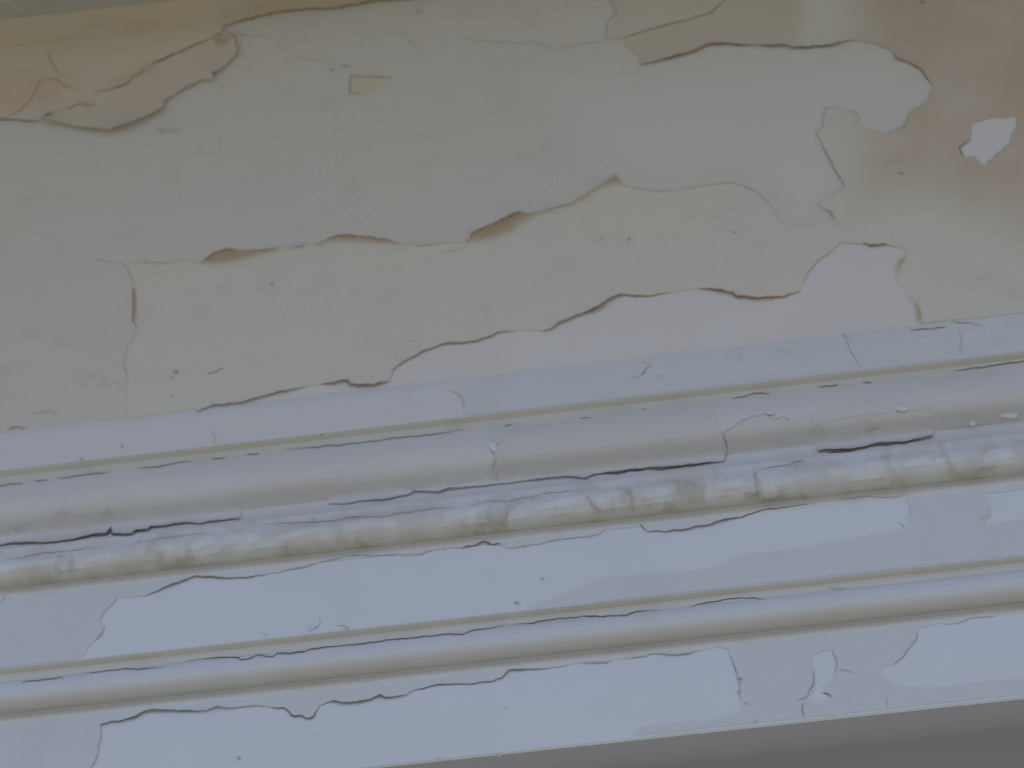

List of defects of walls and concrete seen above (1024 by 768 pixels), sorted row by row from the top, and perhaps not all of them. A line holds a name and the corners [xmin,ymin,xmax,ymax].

peeling [0,0,393,129]
peeling [124,40,1024,419]
crack [0,472,106,486]
crack [144,431,257,468]
crack [288,430,455,450]
crack [709,392,789,461]
peeling [0,486,241,546]
peeling [528,485,1024,611]
peeling [0,503,810,667]
crack [691,597,760,607]
crack [88,610,647,673]
peeling [0,616,1024,768]